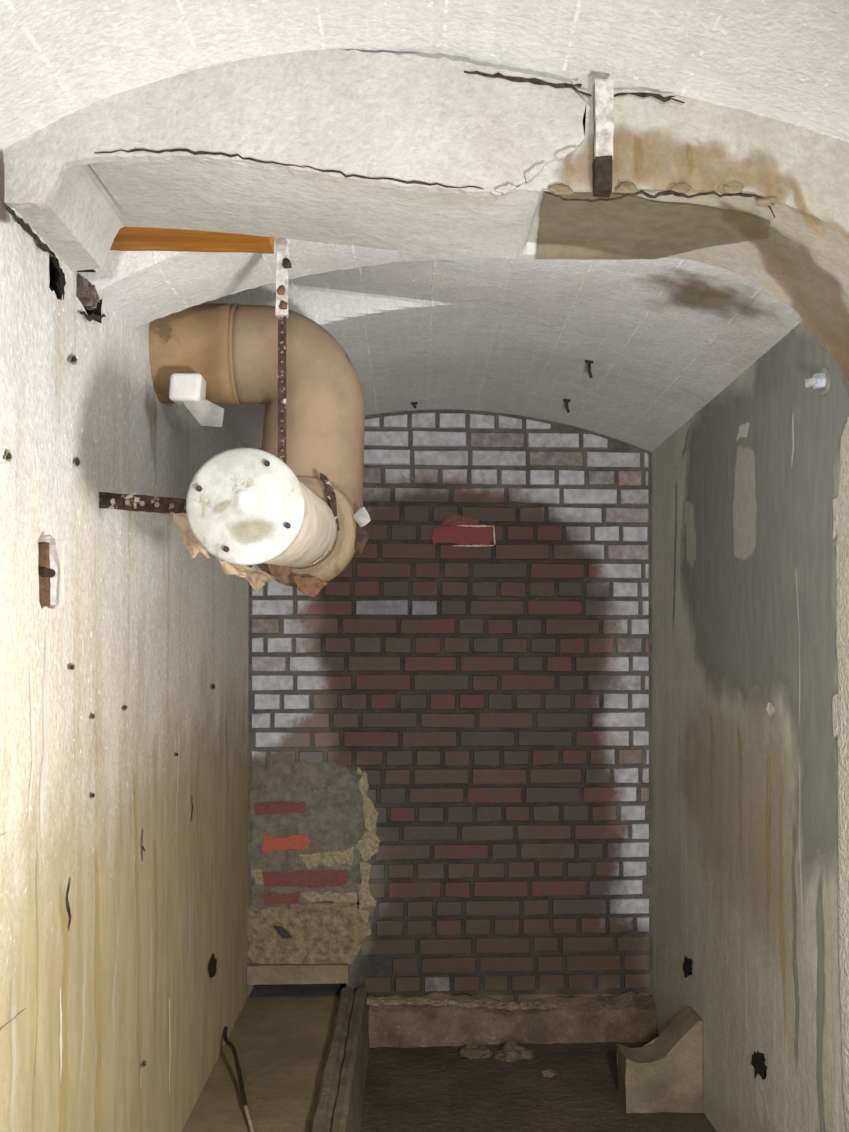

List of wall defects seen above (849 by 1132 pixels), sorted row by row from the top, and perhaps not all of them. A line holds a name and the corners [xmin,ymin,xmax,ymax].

crack [464,71,685,103]
water stain [536,191,770,260]
water stain [673,328,849,1051]
flaking render [274,926,291,939]
flaking render [251,767,381,937]
water stain [817,885,825,1132]